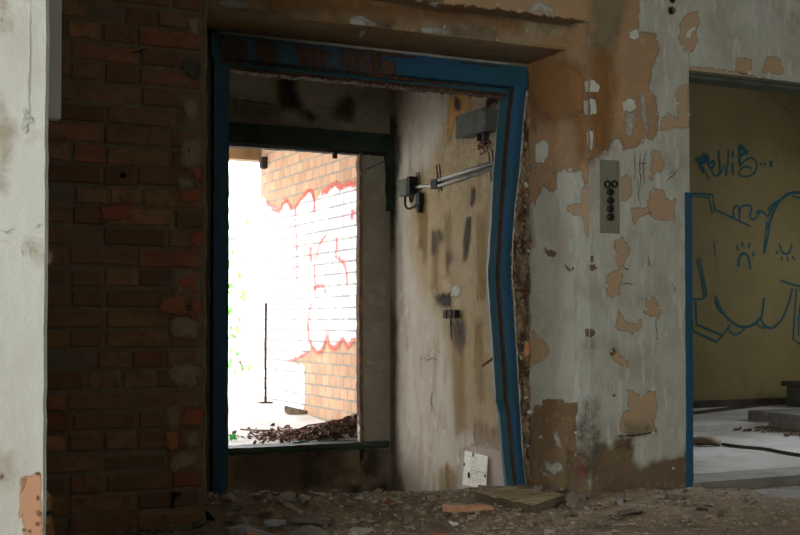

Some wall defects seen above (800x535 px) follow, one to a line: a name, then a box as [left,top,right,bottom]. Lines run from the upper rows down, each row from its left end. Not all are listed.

peeling [679,12,699,54]
peeling [689,56,785,79]
peeling [415,0,690,490]
peeling [19,472,44,535]